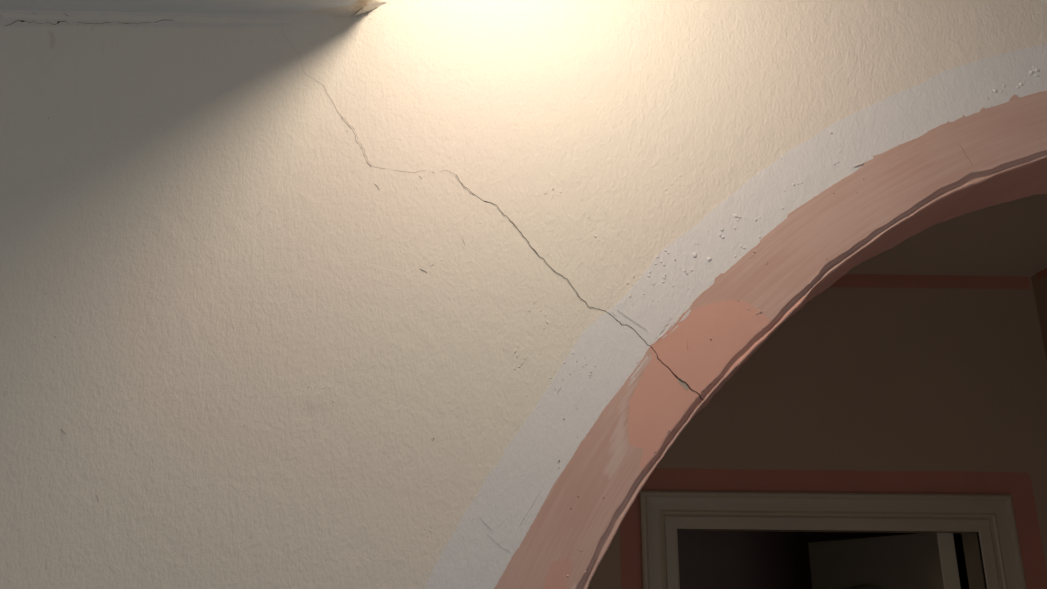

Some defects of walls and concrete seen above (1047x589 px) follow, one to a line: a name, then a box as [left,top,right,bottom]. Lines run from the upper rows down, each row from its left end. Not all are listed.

crack [283,36,711,404]